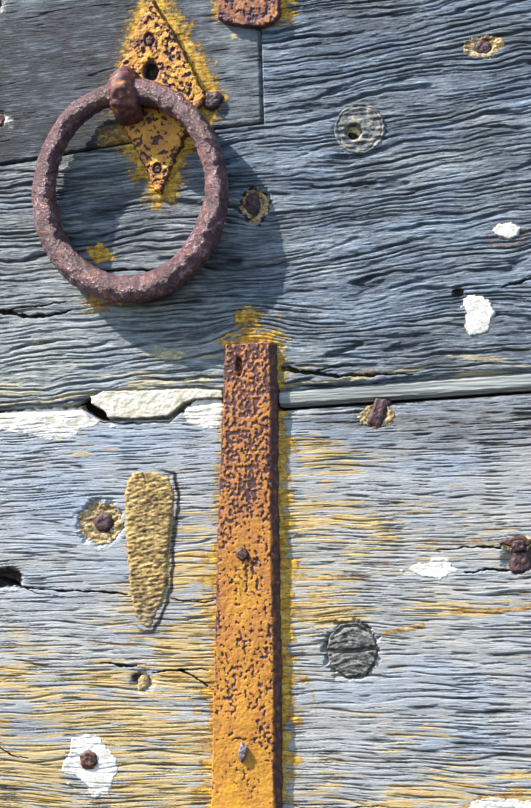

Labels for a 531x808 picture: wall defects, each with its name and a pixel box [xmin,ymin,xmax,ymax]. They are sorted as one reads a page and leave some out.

corrosion [116,0,229,102]
corrosion [199,107,221,125]
corrosion [97,119,195,210]
corrosion [86,242,116,264]
crack [0,301,72,318]
corrosion [80,294,128,315]
crack [99,407,187,425]
crack [439,544,502,552]
crack [465,567,510,575]
crack [1,577,129,597]
corrosion [278,411,314,804]
corrosion [192,532,218,808]